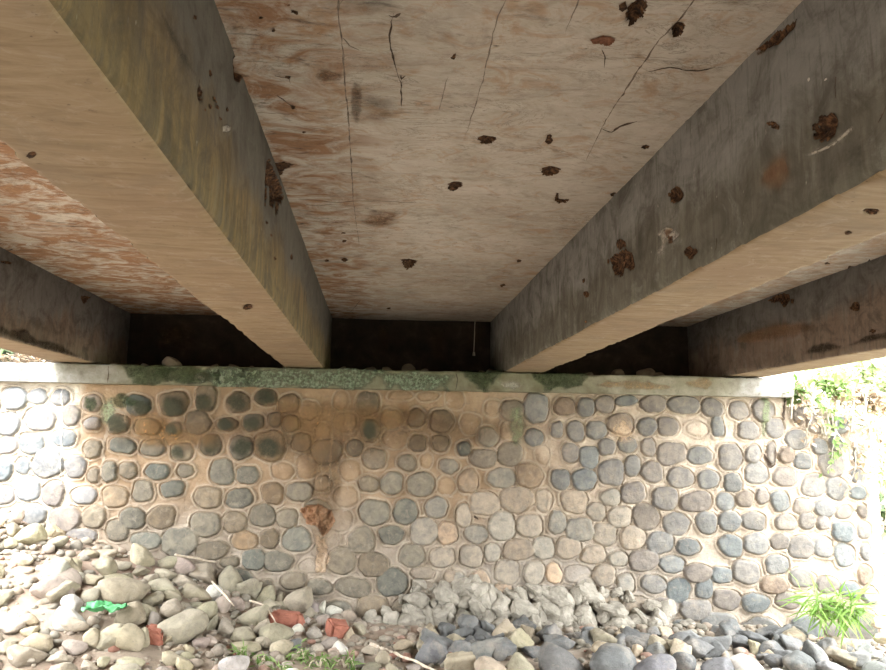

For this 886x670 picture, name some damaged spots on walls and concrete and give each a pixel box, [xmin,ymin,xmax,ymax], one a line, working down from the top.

spalling [619,0,648,26]
spalling [756,19,797,55]
crack [388,13,405,106]
crack [465,0,506,136]
crack [649,65,715,73]
spalling [811,113,852,154]
spalling [264,159,295,237]
spalling [668,186,684,203]
spalling [607,239,635,277]
leakage [0,326,72,355]
leakage [808,343,837,353]
spalling [300,504,335,573]